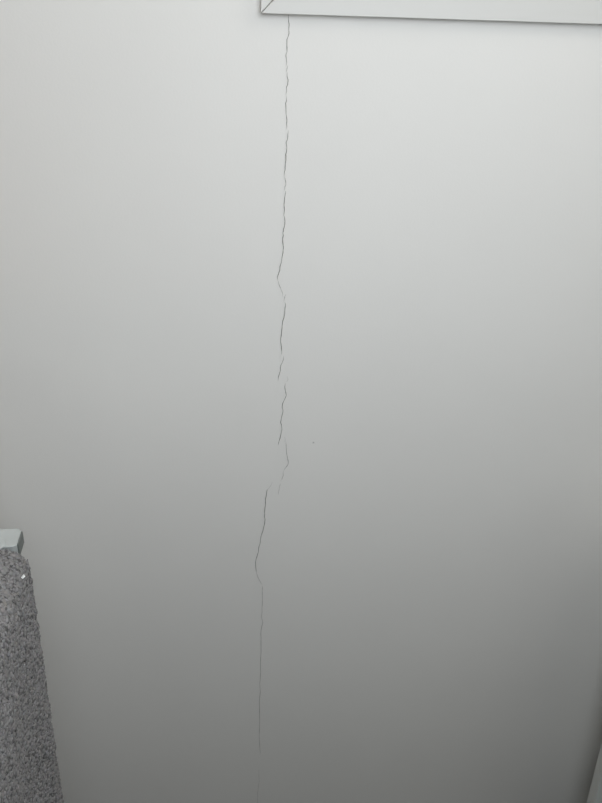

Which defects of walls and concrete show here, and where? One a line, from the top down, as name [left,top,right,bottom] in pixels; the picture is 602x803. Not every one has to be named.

crack [255,14,289,589]